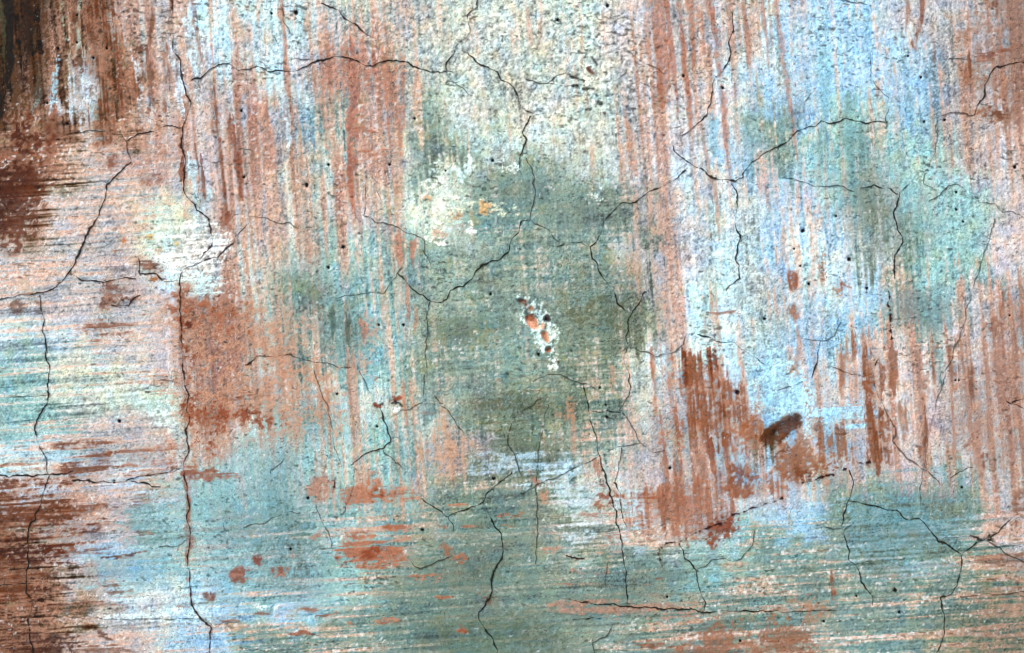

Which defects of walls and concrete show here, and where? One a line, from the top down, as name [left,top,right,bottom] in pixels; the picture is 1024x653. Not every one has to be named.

crack [0,0,478,653]
crack [243,12,890,653]
crack [777,61,1024,653]